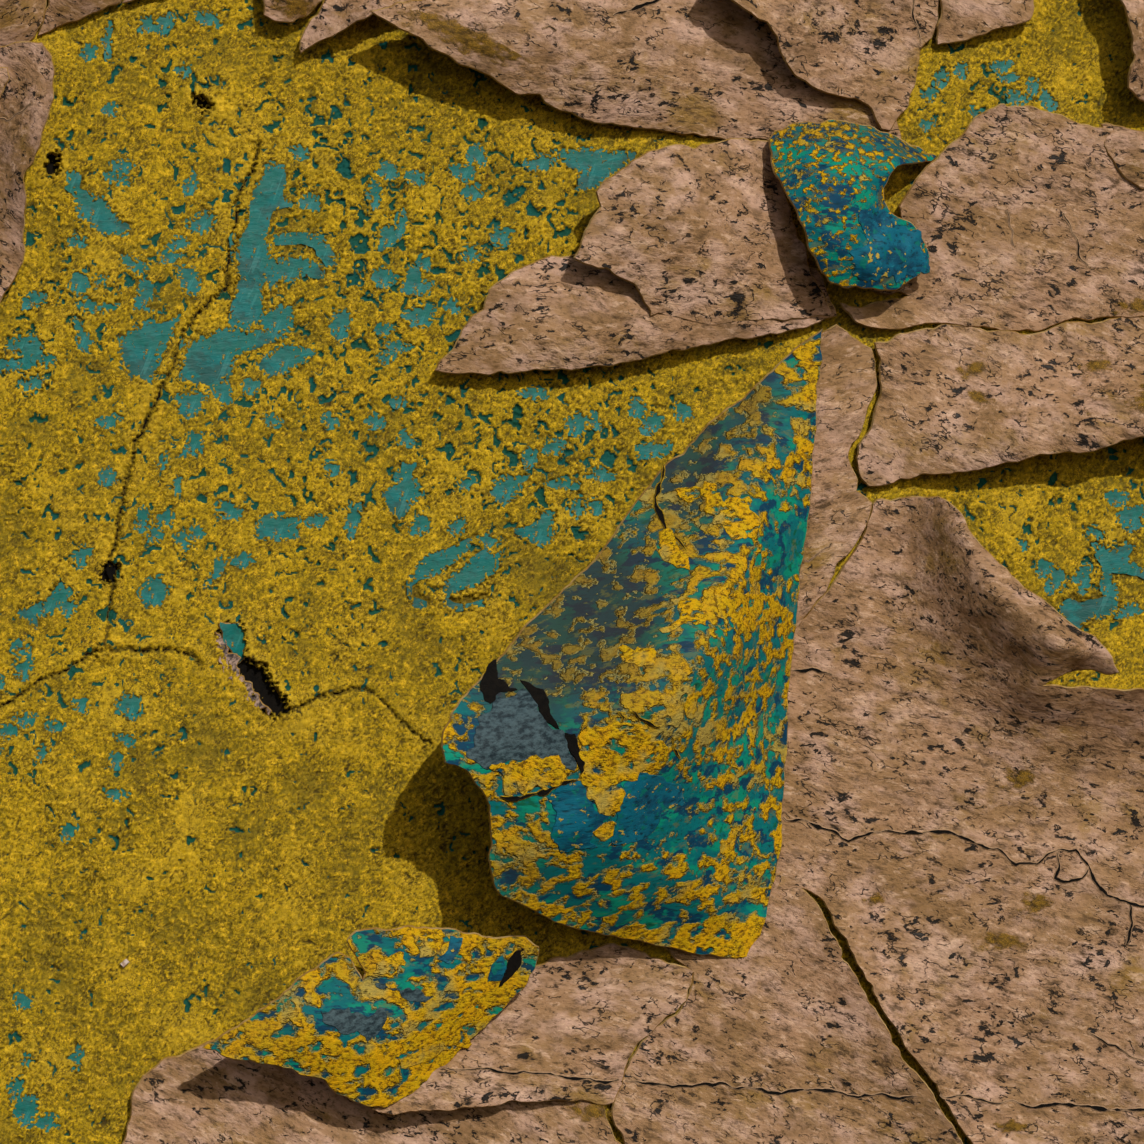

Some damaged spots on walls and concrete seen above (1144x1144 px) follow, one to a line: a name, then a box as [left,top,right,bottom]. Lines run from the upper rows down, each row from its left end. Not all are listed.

peeling [0,0,135,303]
crack [106,144,259,618]
peeling [64,144,338,497]
peeling [262,0,1034,376]
peeling [839,76,1144,487]
peeling [1119,0,1144,102]
crack [3,651,95,706]
crack [134,647,199,662]
peeling [122,324,1144,1144]
crack [783,816,1144,947]
crack [445,1066,1144,1112]
crack [1087,1031,1144,1063]